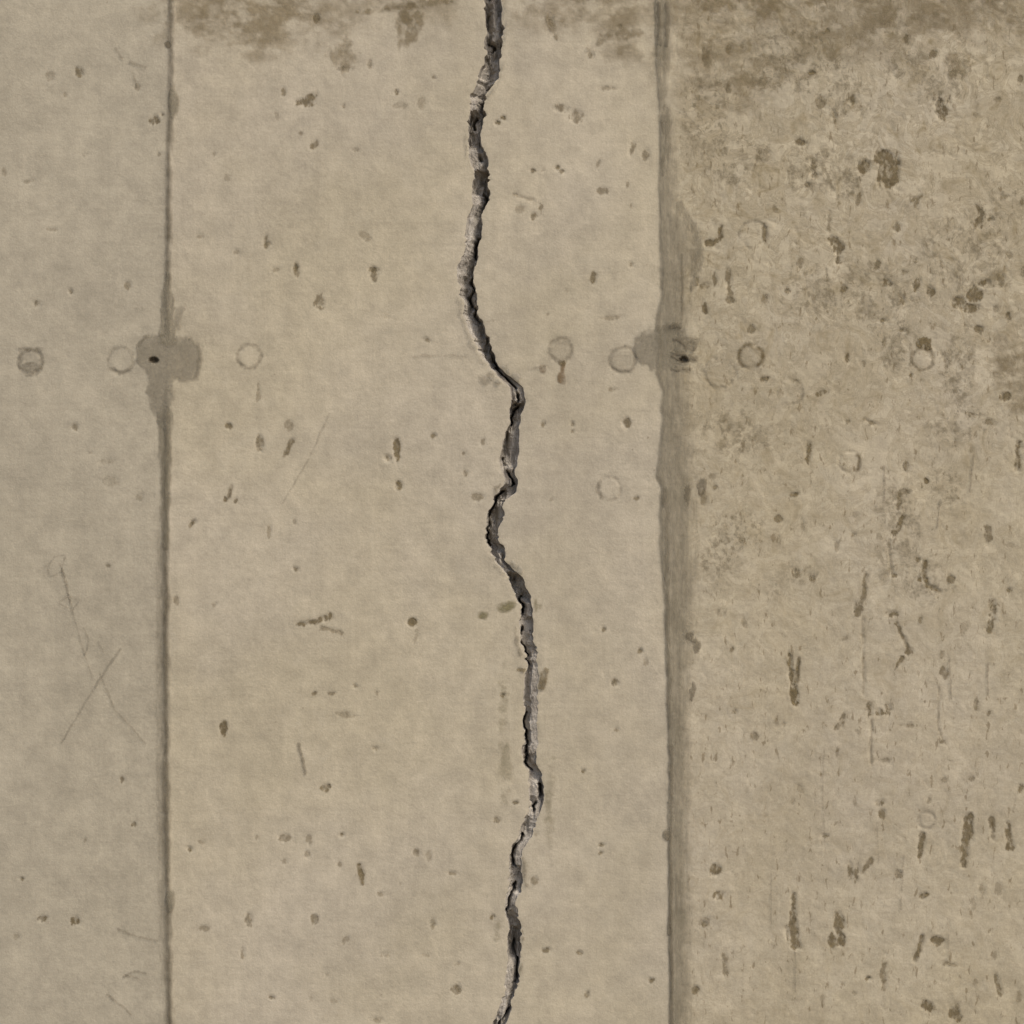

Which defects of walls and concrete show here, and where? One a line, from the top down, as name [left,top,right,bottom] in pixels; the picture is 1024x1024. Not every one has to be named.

crack [457,0,549,1024]